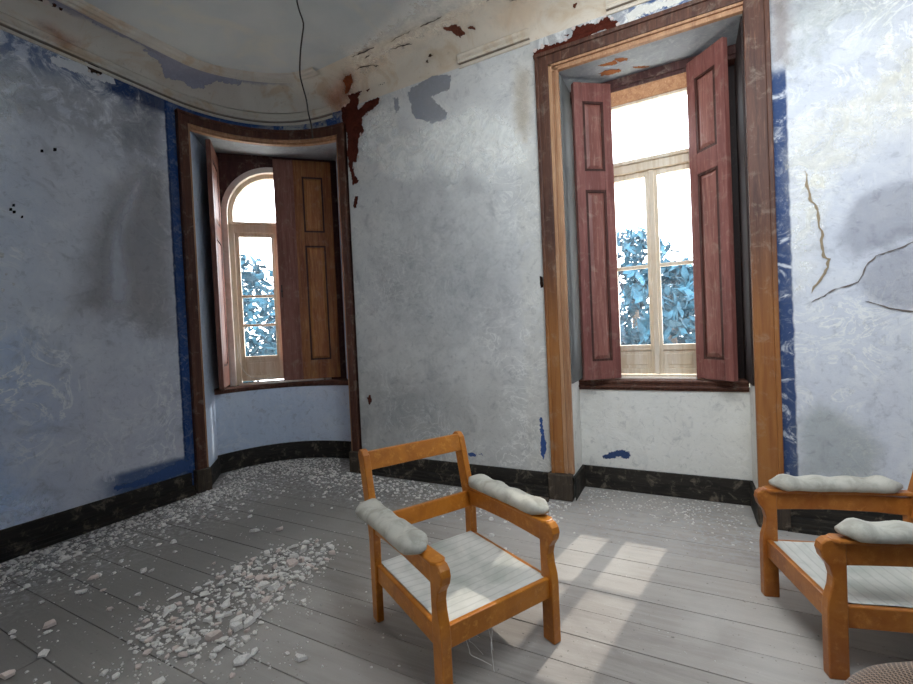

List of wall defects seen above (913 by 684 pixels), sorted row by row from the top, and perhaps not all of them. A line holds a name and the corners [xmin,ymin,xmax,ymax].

peeling [39,0,241,89]
crack [353,17,441,69]
spalling [443,24,475,38]
spalling [533,0,683,55]
peeling [394,75,451,123]
spalling [341,74,380,185]
crack [812,242,913,312]